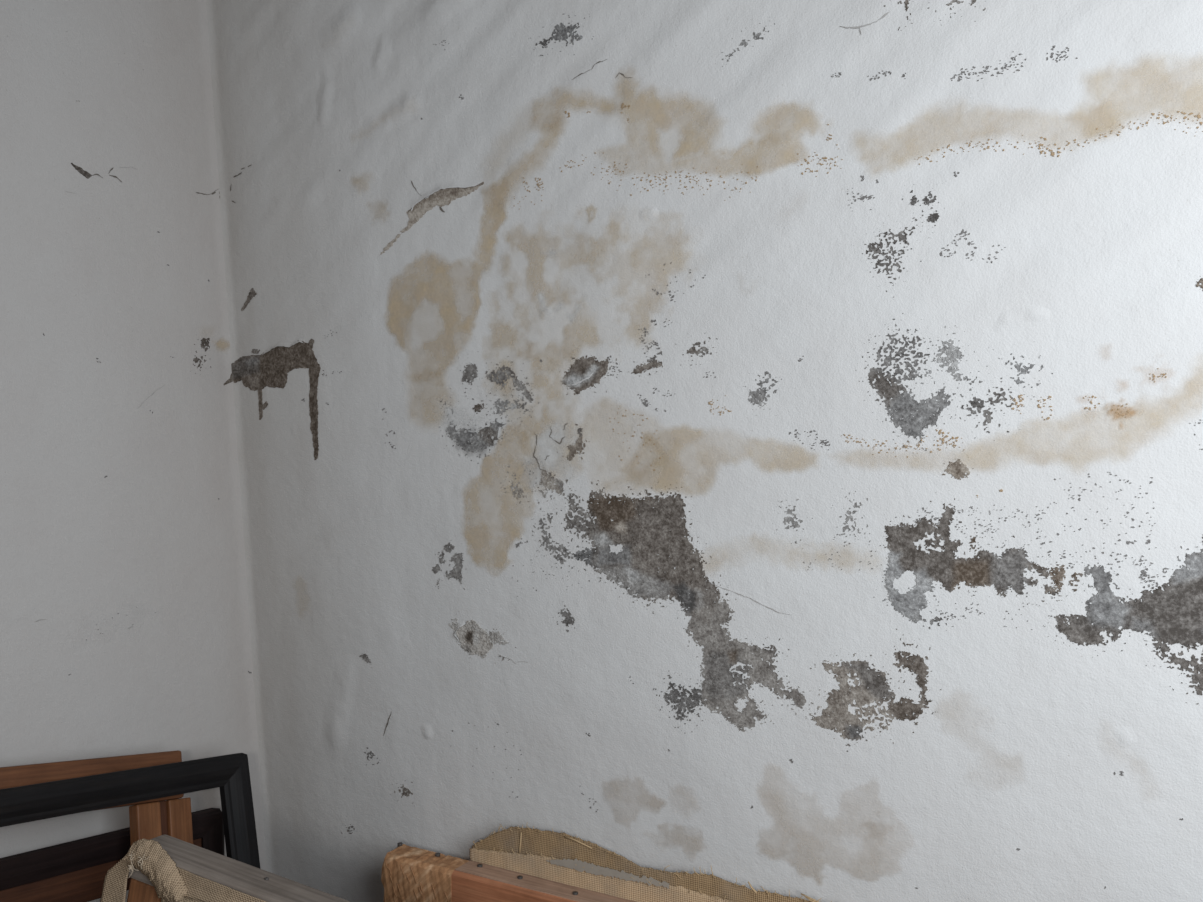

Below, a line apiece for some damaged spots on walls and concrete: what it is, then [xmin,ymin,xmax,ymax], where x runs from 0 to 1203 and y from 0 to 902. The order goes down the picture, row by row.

peeling [528,14,594,56]
leakage [951,51,1026,81]
leakage [388,177,511,368]
flaking render [224,330,342,460]
spalling [449,611,516,664]
peeling [434,356,540,464]
leakage [427,381,579,587]
peeling [559,350,617,397]
leakage [772,429,830,468]
peeling [509,424,1203,752]
peeling [859,319,1053,451]
leakage [955,472,1169,588]